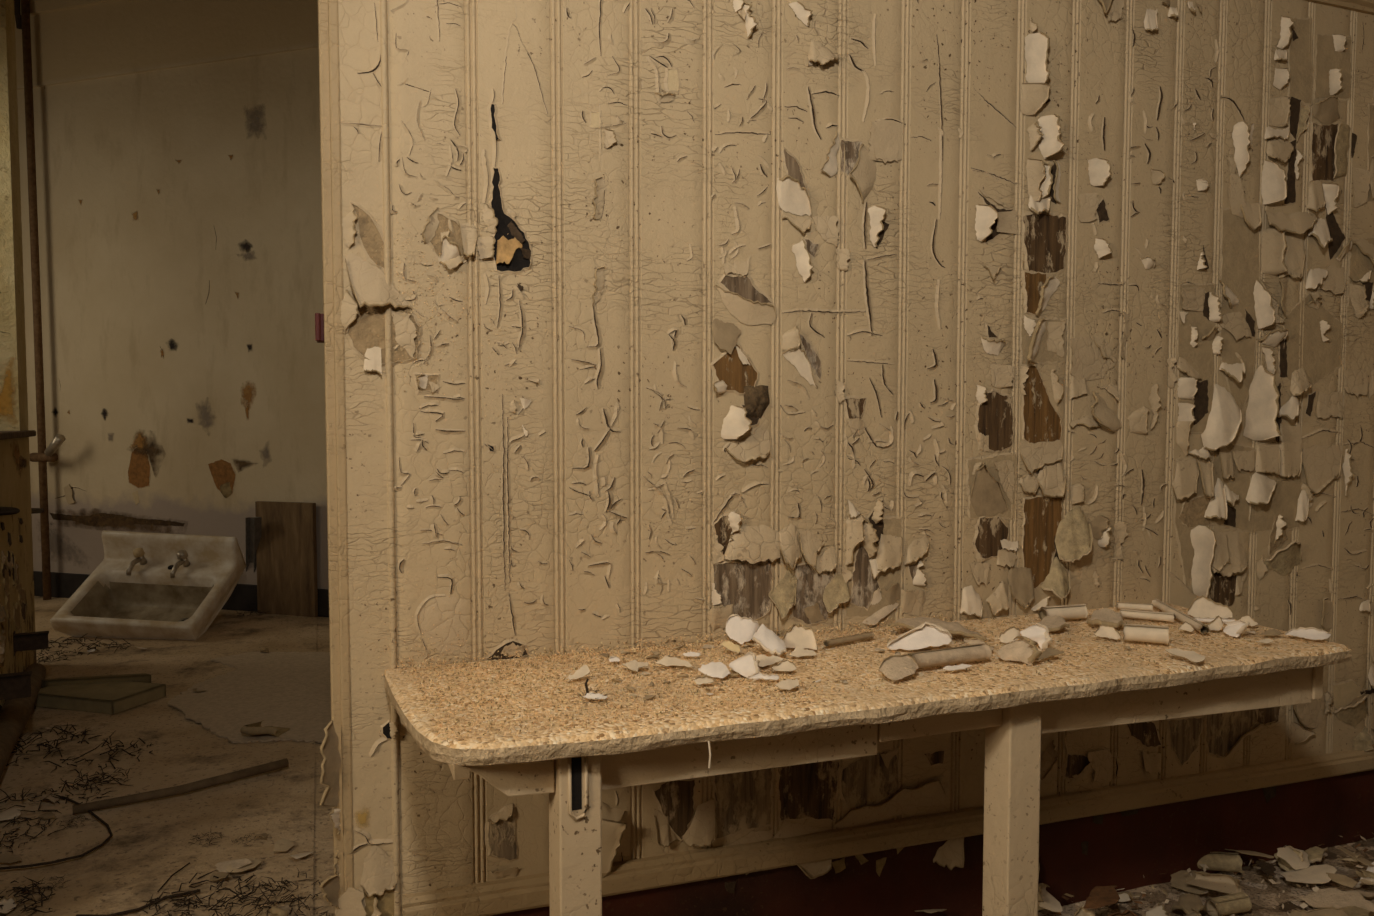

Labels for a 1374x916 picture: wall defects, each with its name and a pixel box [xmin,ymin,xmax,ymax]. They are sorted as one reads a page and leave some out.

peeling [733,0,759,39]
peeling [787,0,839,66]
peeling [1132,0,1202,46]
peeling [340,201,440,395]
crack [340,0,1017,621]
peeling [1127,16,1374,644]
peeling [49,433,185,558]
spalling [208,458,252,499]
peeling [652,748,946,848]
peeling [797,847,904,879]
peeling [933,837,964,870]